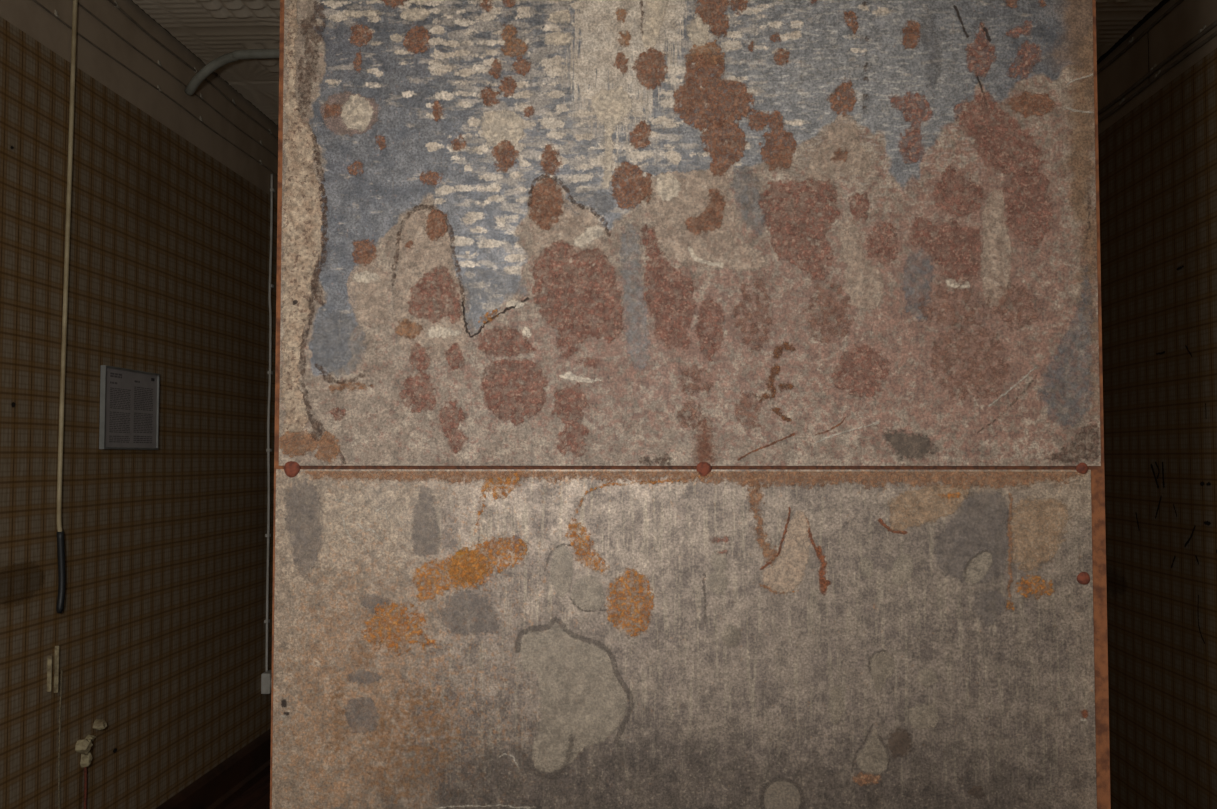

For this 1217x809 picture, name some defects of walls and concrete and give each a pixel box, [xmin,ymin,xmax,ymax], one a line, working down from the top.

corrosion [481,25,532,106]
peeling [280,0,379,437]
peeling [346,204,468,360]
peeling [528,174,611,284]
corrosion [611,0,898,397]
corrosion [279,225,1100,637]
corrosion [361,535,529,656]
peeling [760,507,810,594]
leakage [887,485,1068,625]
leakage [519,623,628,772]
leakage [764,779,801,809]
leakage [853,703,938,786]